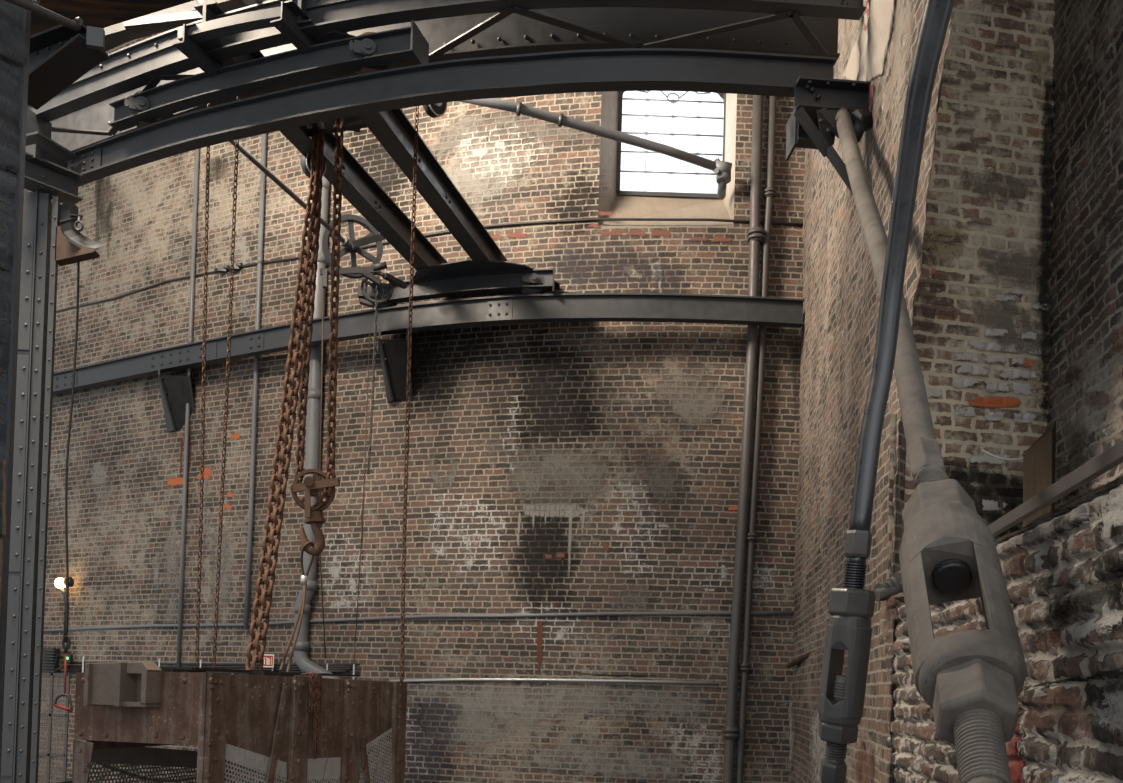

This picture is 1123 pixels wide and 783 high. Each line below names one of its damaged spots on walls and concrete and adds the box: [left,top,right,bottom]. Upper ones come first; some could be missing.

water stain [926,329,1051,398]
water stain [502,395,521,470]
spalling [969,396,1021,408]
water stain [955,406,1036,423]
water stain [968,451,1011,465]
water stain [430,490,588,573]
water stain [982,500,1008,511]
water stain [1091,489,1123,545]
water stain [1066,602,1123,643]
water stain [1098,686,1123,734]
water stain [1017,696,1033,783]
water stain [1049,766,1105,783]